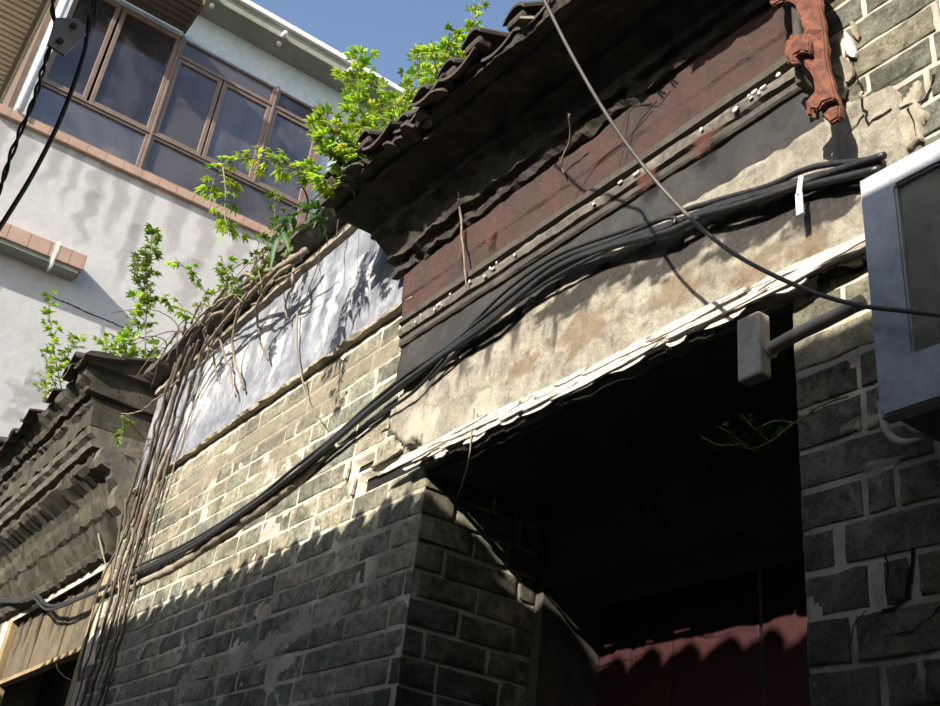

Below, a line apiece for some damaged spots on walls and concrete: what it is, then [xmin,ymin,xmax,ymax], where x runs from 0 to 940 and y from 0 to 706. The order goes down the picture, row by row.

crack [839,23,935,144]
peeling [344,233,865,496]
leakage [426,177,865,388]